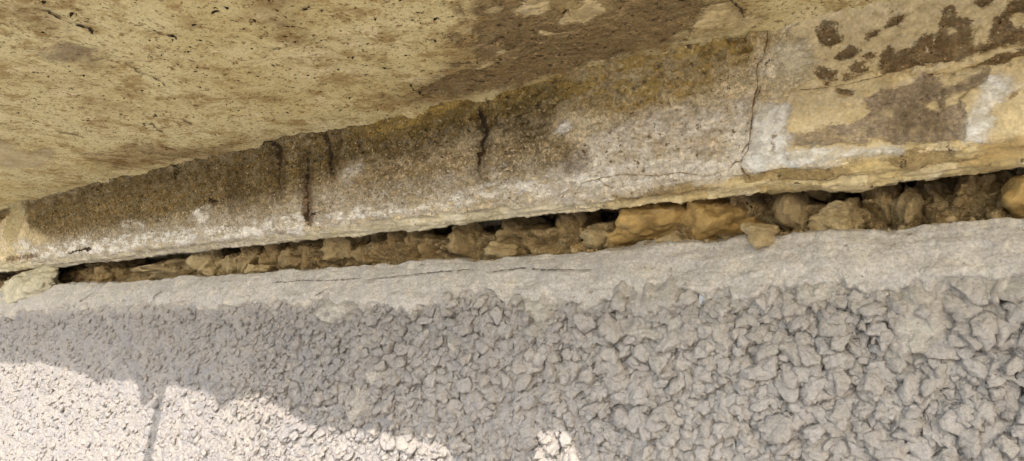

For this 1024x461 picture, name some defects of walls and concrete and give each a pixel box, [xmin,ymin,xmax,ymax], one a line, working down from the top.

crack [271,131,332,226]
damp [13,36,904,268]
crack [476,111,489,168]
crack [574,0,770,189]
damp [965,75,1011,143]